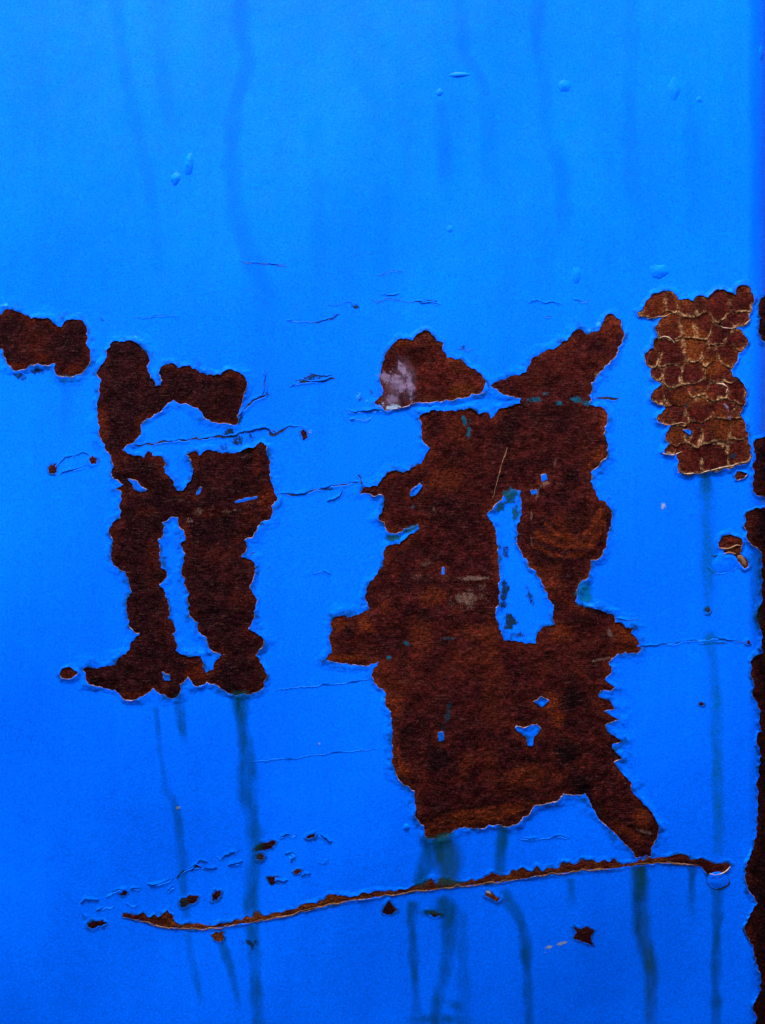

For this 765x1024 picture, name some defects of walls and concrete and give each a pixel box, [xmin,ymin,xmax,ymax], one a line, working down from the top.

peeling [302,830,318,842]
rust [498,828,506,853]
peeling [251,838,304,886]
peeling [117,886,130,898]
peeling [177,886,224,911]
peeling [83,917,109,933]
rust [645,947,655,974]